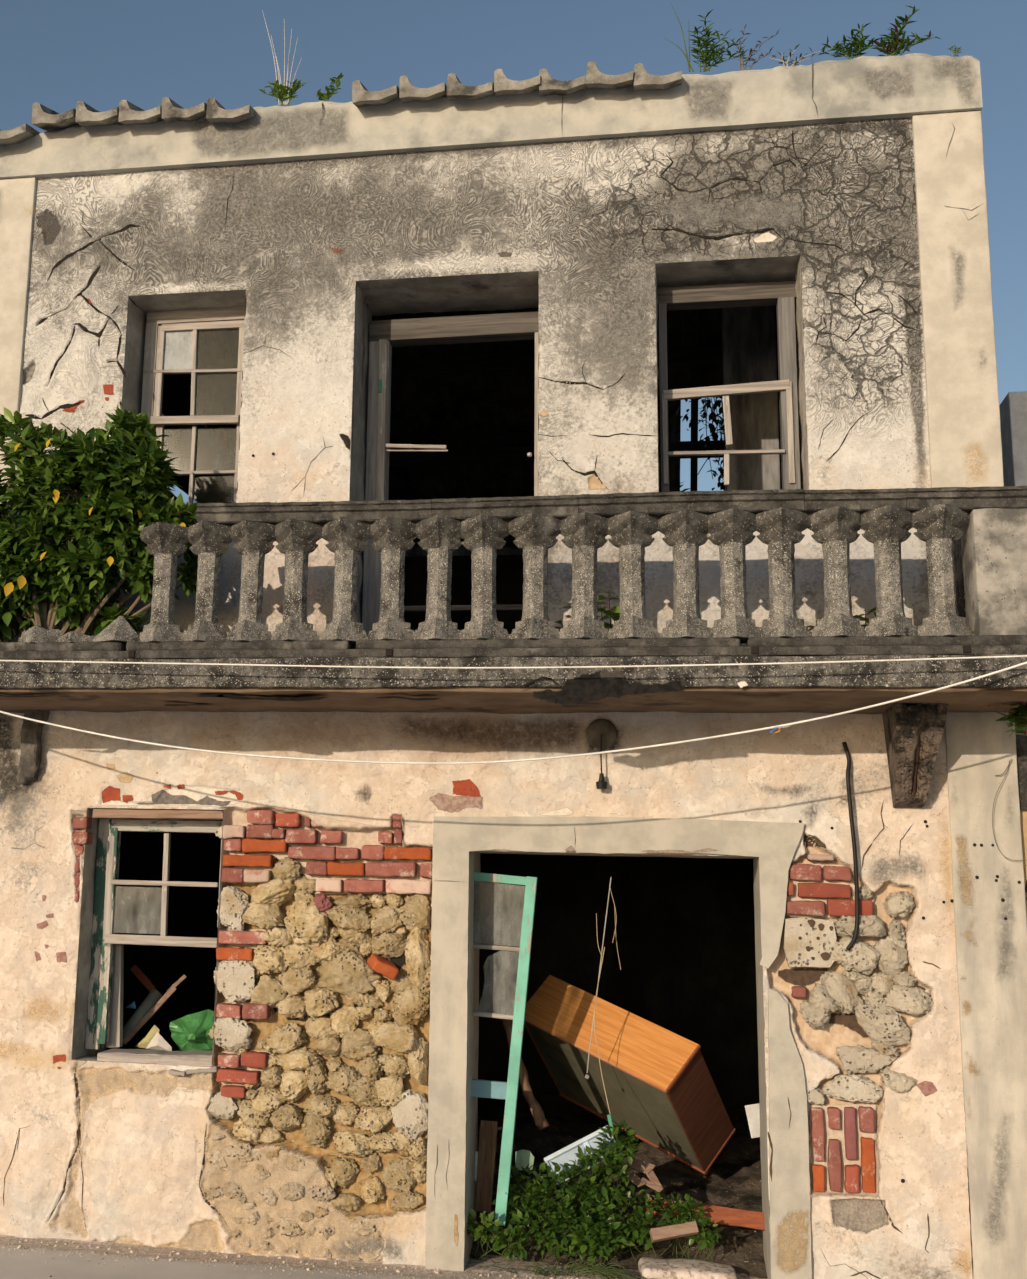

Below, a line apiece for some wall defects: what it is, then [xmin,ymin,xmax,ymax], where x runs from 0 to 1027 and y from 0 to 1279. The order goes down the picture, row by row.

crack [652,59,918,342]
crack [25,209,141,433]
crack [539,362,625,390]
crack [538,433,654,490]
crack [818,410,872,461]
peeling [430,779,483,813]
spalling [53,763,433,1262]
spalling [767,835,937,1234]